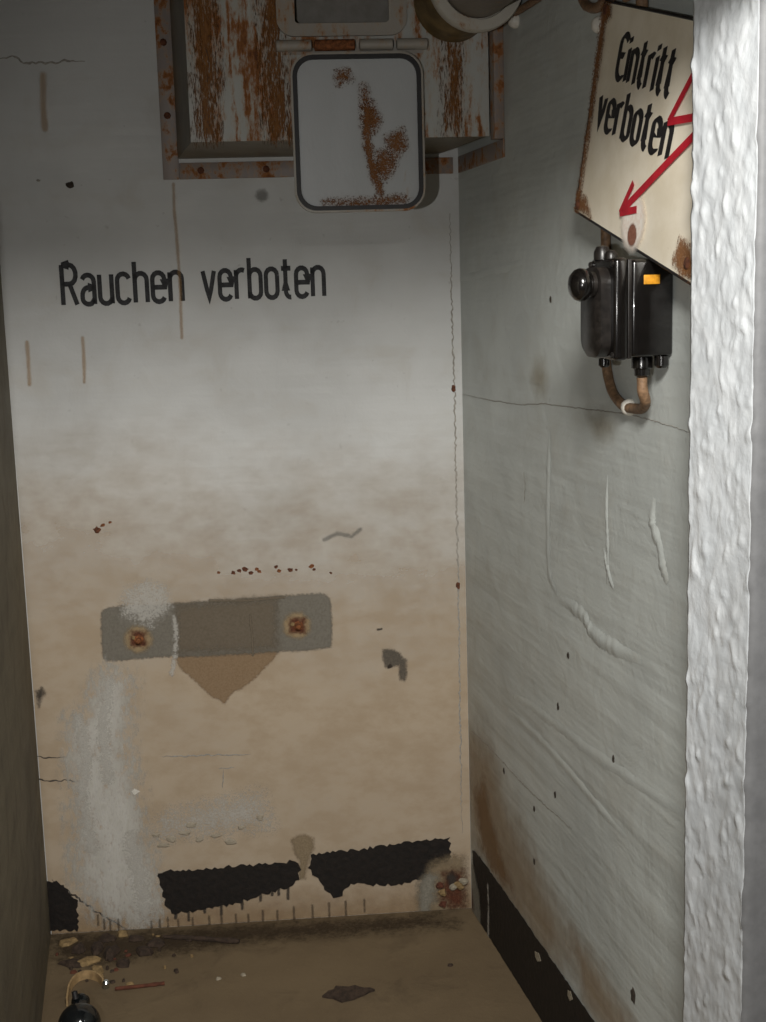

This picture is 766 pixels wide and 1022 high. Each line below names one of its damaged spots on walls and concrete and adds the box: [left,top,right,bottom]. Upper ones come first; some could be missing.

water stain [22,536,551,934]
peeling [47,881,79,931]
peeling [157,835,481,922]